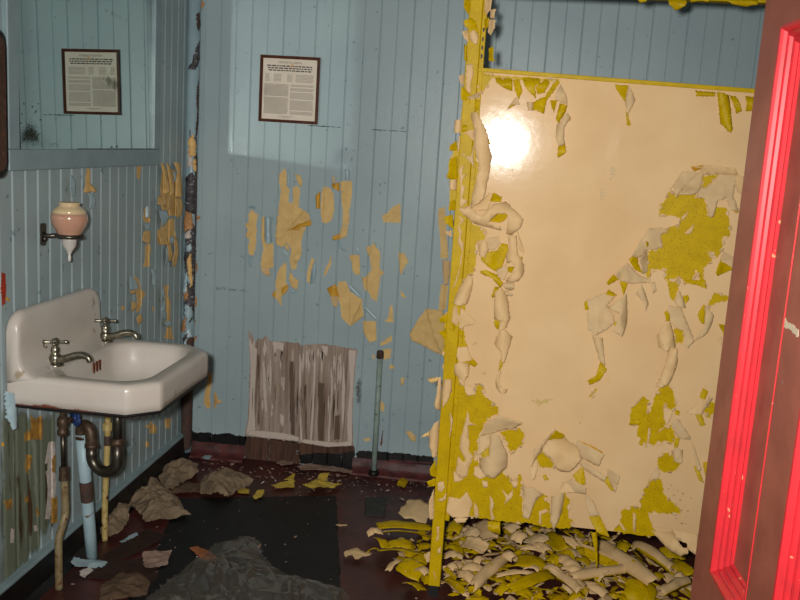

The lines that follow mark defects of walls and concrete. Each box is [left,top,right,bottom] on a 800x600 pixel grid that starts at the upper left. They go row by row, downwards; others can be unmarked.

peeling [188,41,200,70]
mould [20,124,40,145]
peeling [695,90,754,133]
peeling [142,81,201,345]
peeling [382,203,401,223]
peeling [245,168,394,369]
peeling [120,276,145,331]
peeling [396,0,744,600]
peeling [3,391,18,430]
peeling [245,330,358,480]
peeling [45,441,57,519]